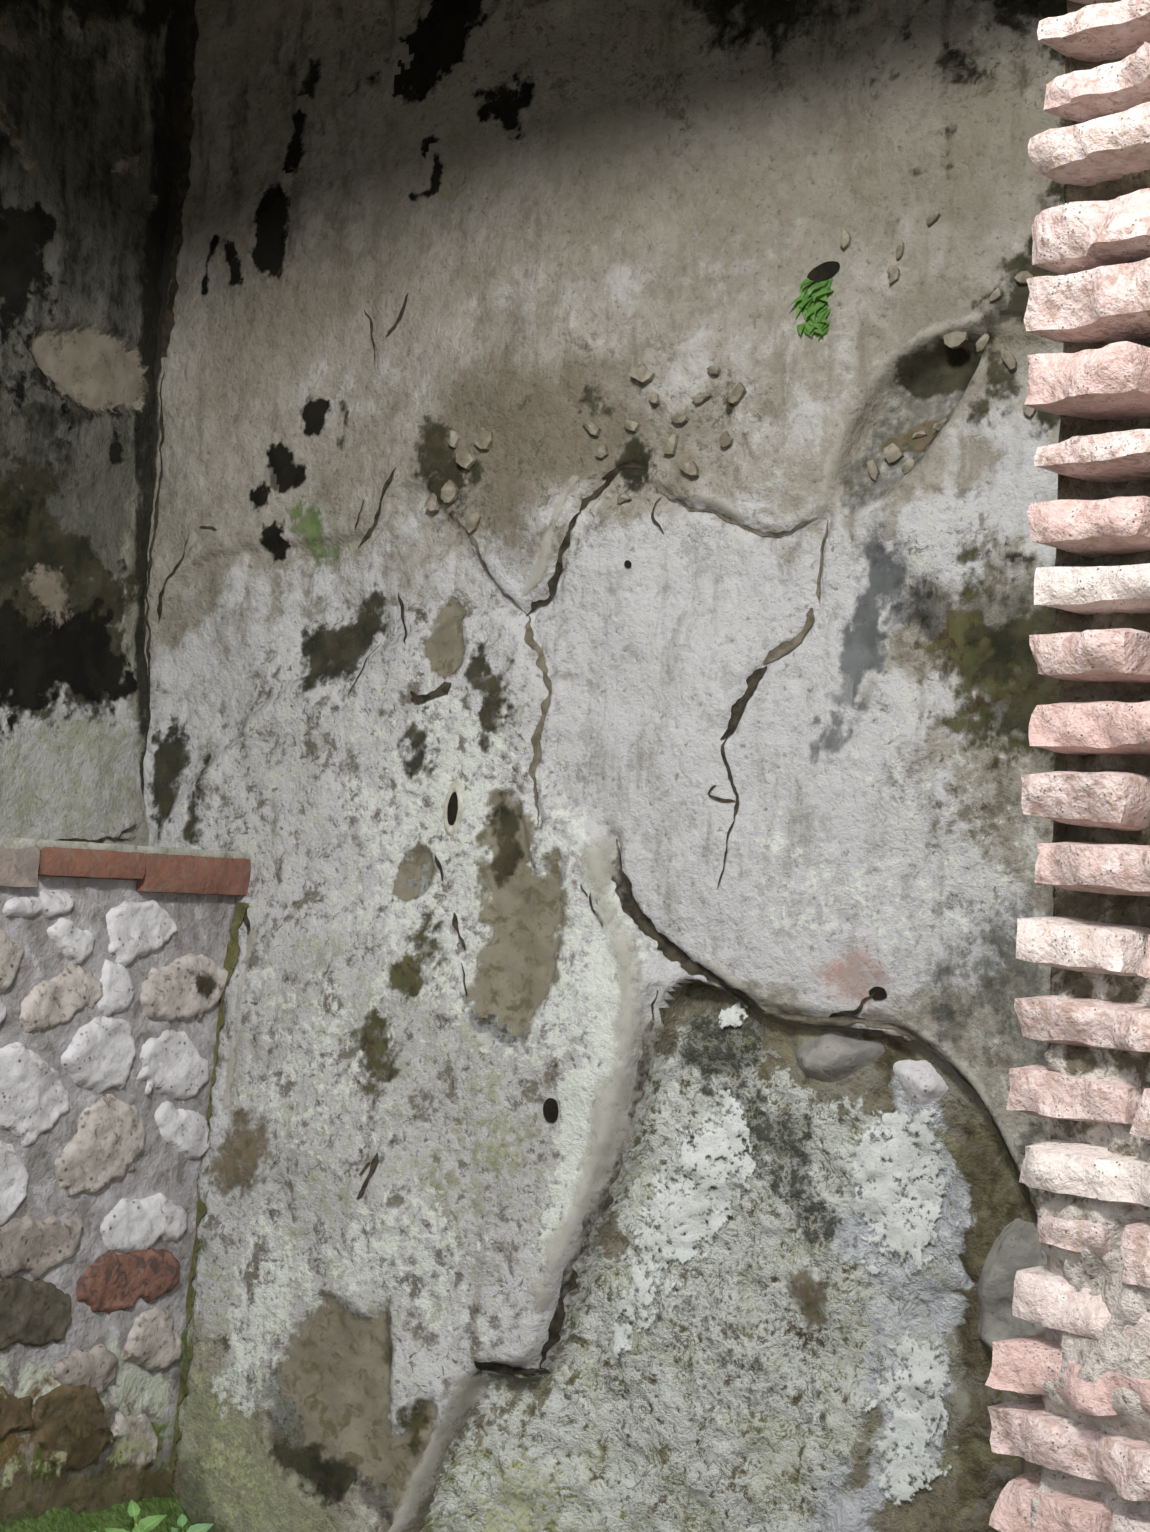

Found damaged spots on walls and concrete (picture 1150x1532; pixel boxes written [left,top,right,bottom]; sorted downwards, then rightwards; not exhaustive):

damp [348,0,488,103]
damp [993,0,1067,36]
damp [0,198,137,464]
flaking render [886,242,905,286]
flaking render [819,288,1017,512]
flaking render [926,211,941,226]
damp [0,448,145,740]
crack [348,593,407,696]
crack [410,681,451,704]
crack [456,460,828,889]
spalling [462,788,575,1037]
crack [401,839,1038,1532]